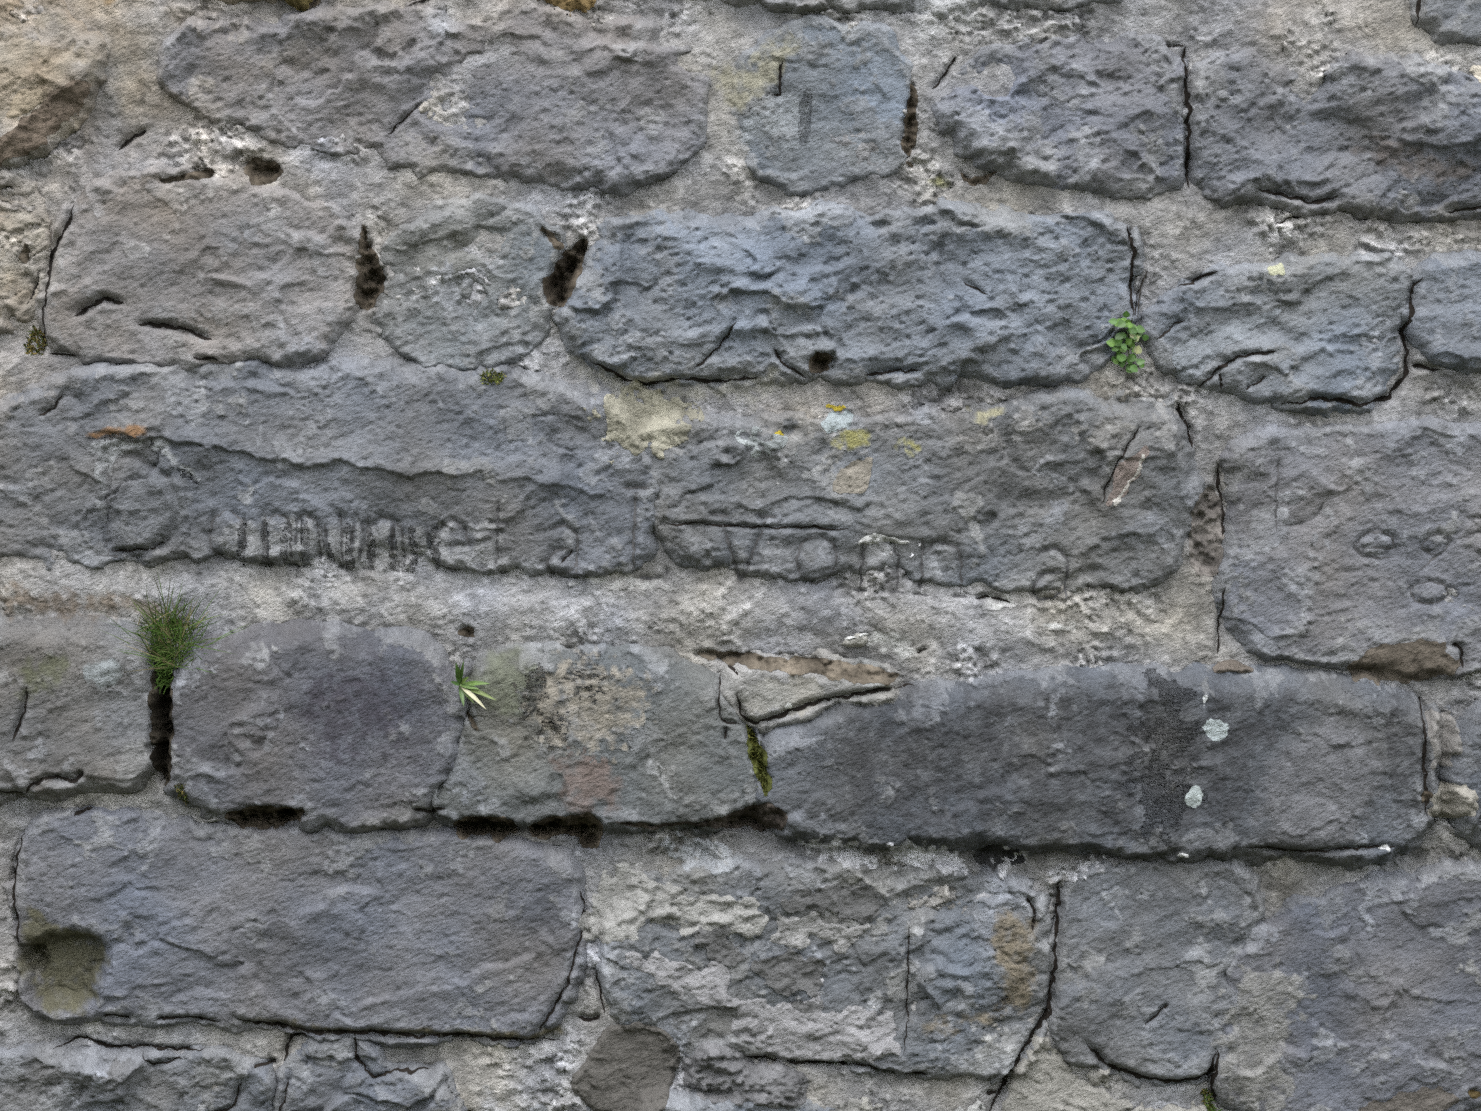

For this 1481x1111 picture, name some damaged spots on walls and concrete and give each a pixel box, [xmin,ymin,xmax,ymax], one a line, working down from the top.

crack [977,595,1011,603]
crack [718,648,927,739]
crack [986,881,1061,1111]